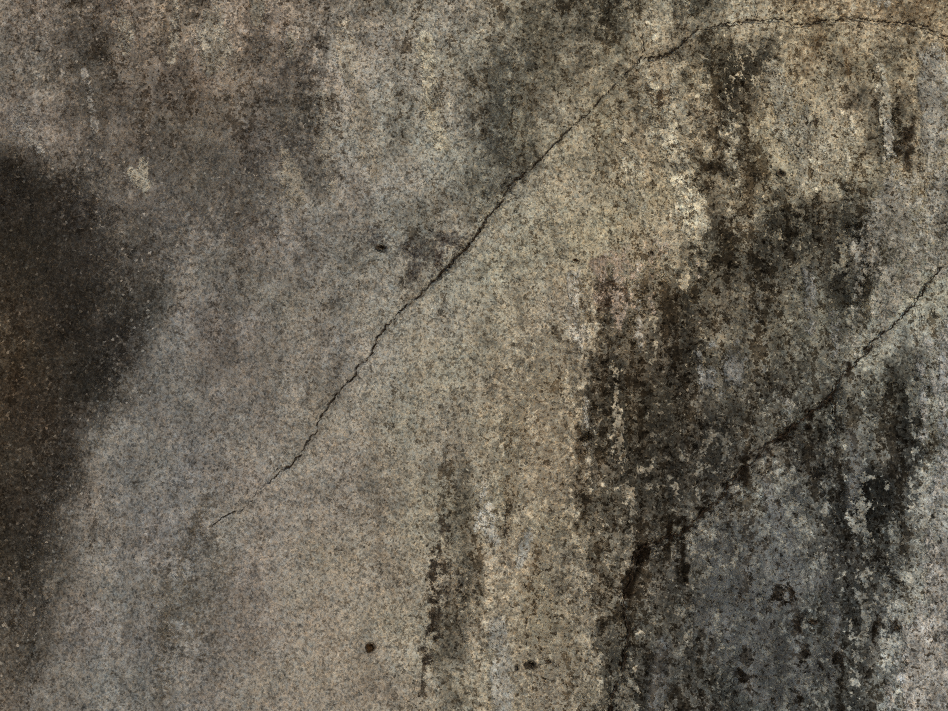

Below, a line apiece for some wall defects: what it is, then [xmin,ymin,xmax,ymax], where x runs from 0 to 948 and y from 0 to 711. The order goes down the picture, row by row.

water stain [0,0,336,703]
water stain [331,16,382,182]
water stain [403,236,462,280]
crack [214,0,948,524]
water stain [553,0,708,67]
water stain [416,13,948,711]
crack [608,266,946,711]
water stain [777,0,948,76]